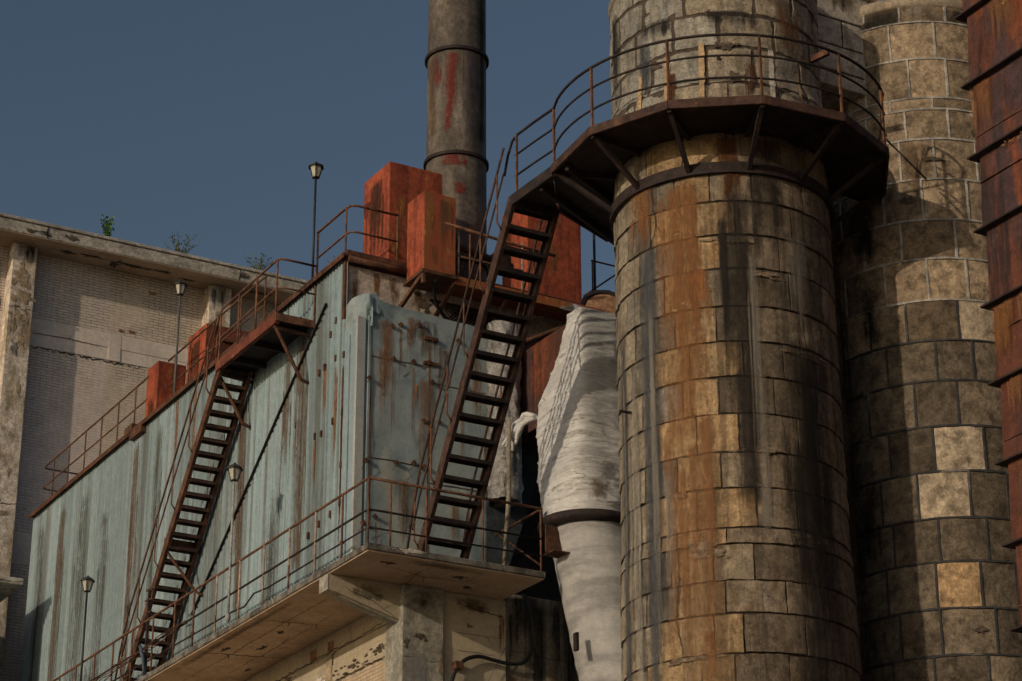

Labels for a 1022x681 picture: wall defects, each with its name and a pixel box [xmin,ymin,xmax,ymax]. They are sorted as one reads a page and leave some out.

peeling [8,261,37,356]
rust [368,289,449,476]
damp [718,221,728,331]
damp [48,513,65,681]